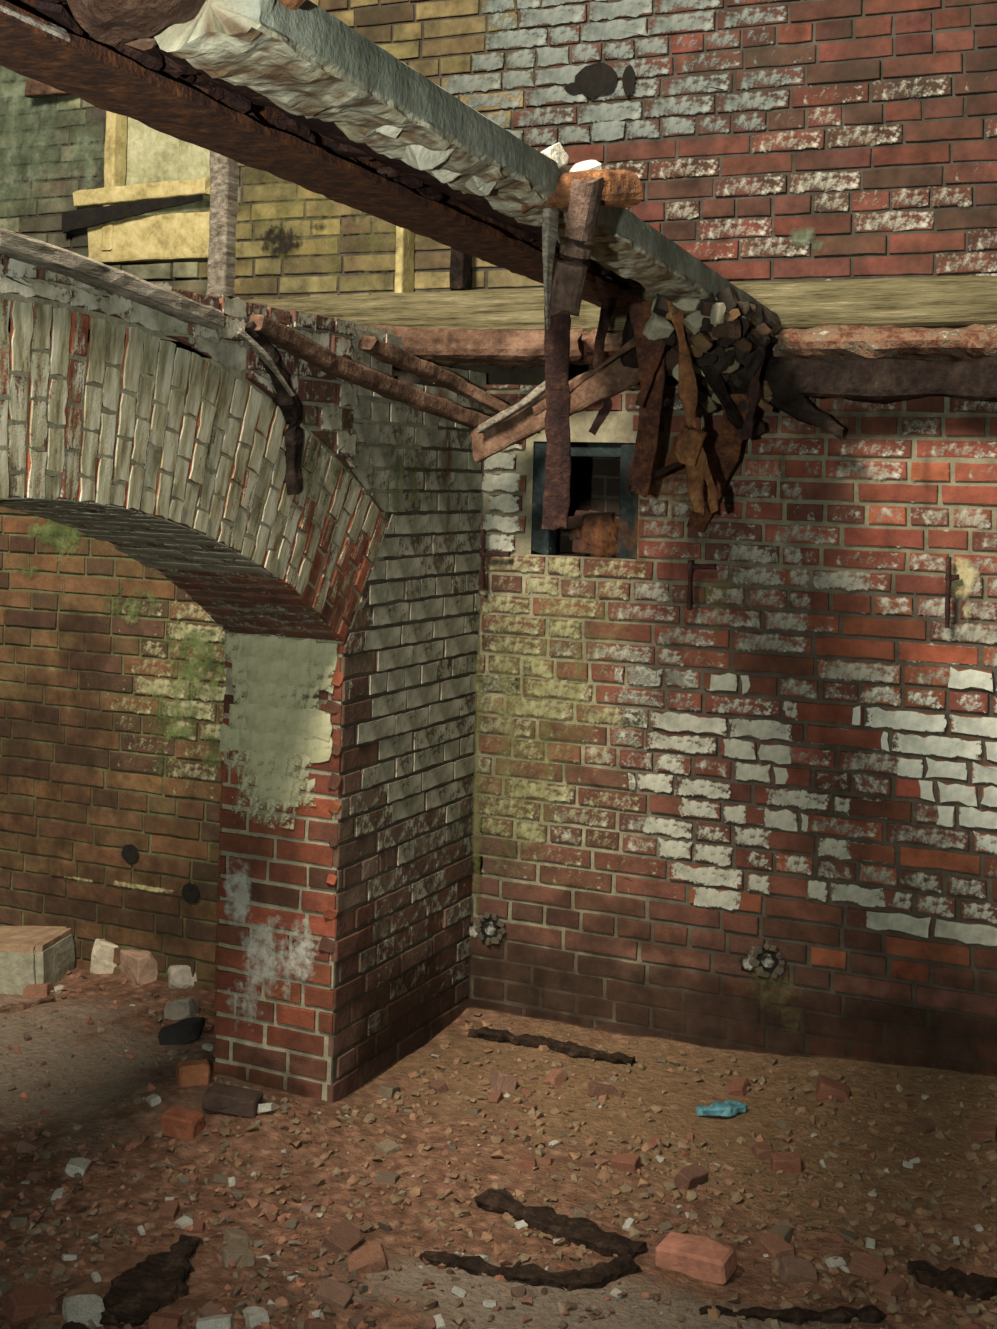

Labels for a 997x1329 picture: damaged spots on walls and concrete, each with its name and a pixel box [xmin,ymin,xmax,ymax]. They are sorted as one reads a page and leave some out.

peeling [804,100,898,145]
peeling [724,172,969,230]
peeling [702,219,807,259]
peeling [938,239,997,276]
peeling [0,255,997,998]
spalling [90,938,199,1021]